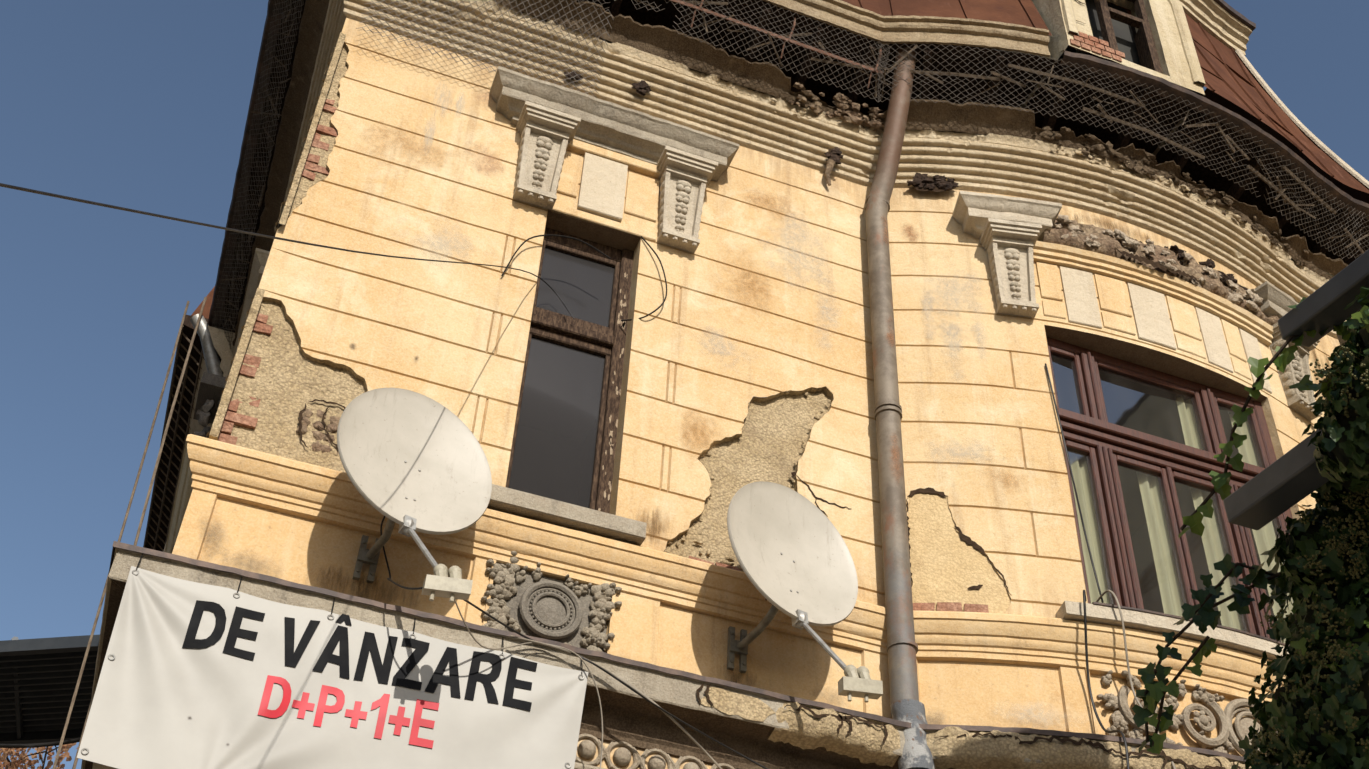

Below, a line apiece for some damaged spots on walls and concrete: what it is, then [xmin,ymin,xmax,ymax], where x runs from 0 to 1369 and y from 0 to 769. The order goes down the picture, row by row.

flaking render [1043,220,1280,326]
flaking render [206,288,368,473]
flaking render [664,386,834,572]